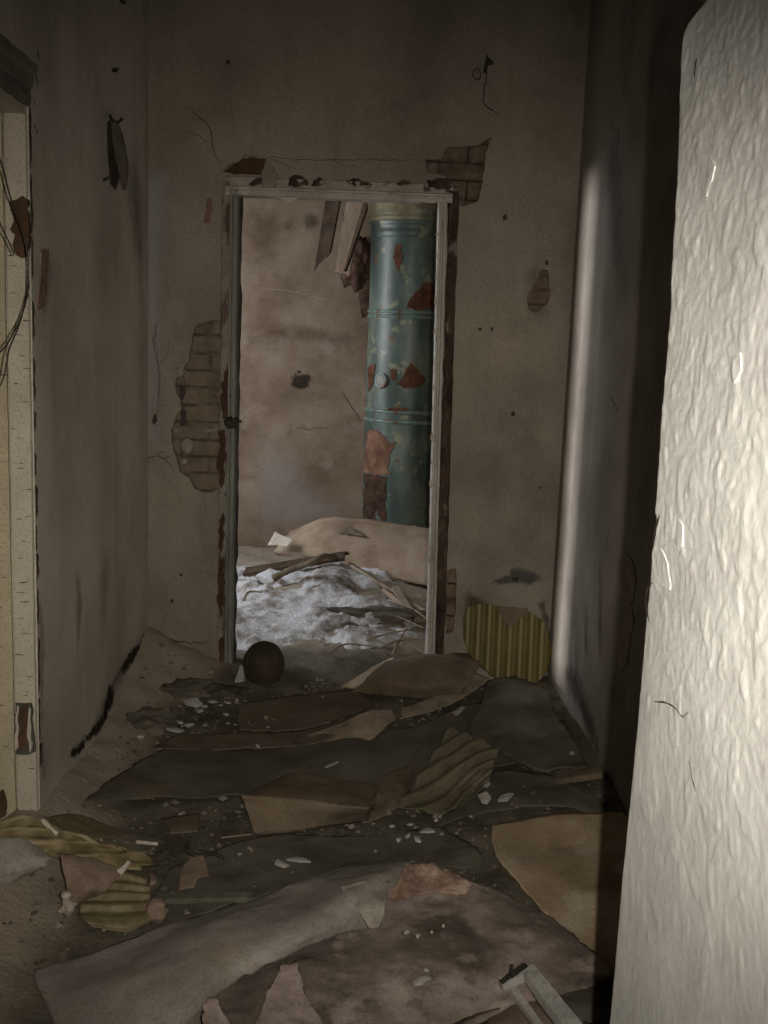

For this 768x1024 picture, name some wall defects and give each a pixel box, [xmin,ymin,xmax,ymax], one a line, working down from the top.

crack [189,108,426,170]
spalling [420,137,492,209]
peeling [9,195,49,310]
spalling [526,260,551,313]
spalling [171,319,228,493]
damp [496,570,539,584]
crack [71,631,209,757]